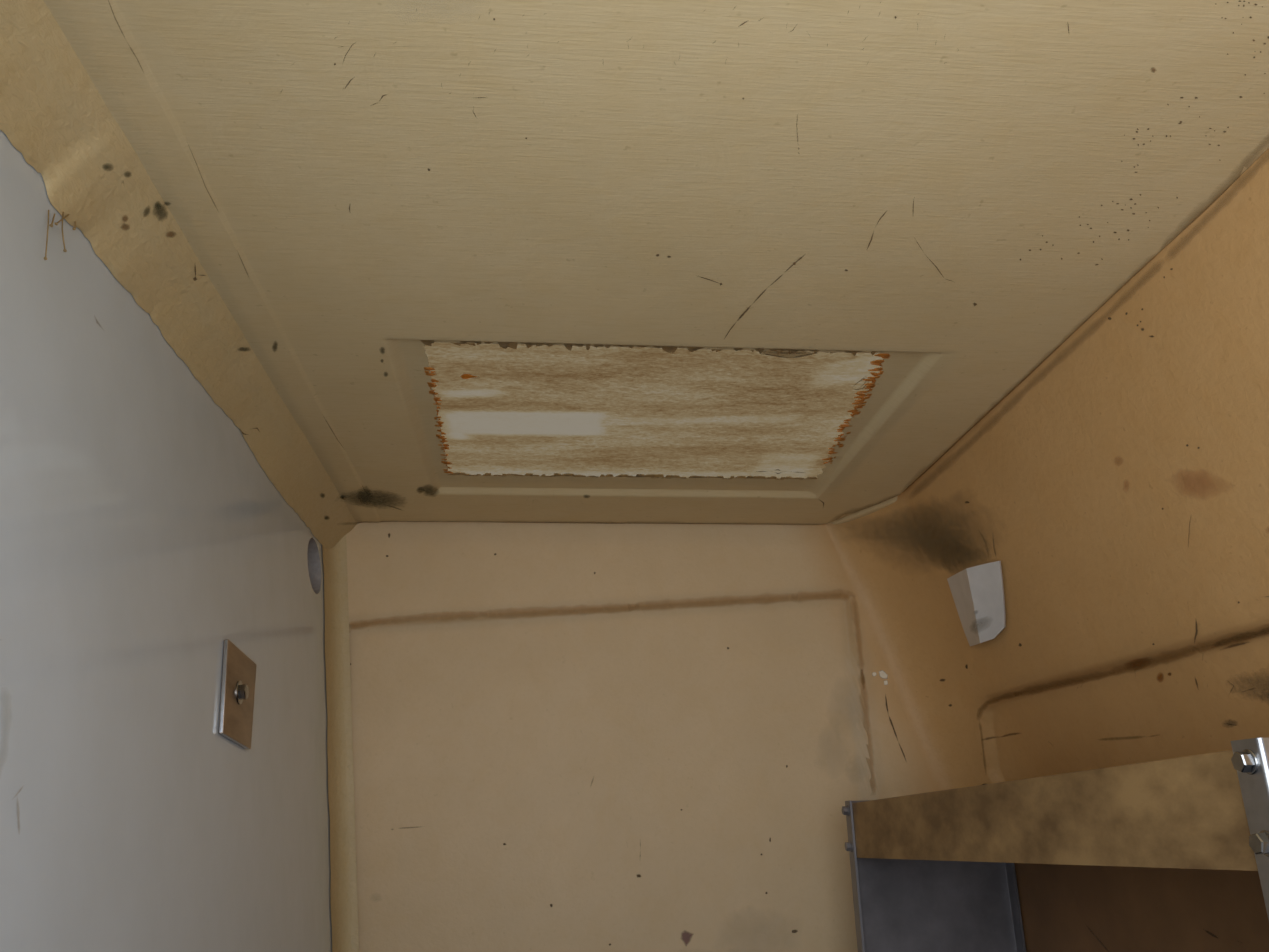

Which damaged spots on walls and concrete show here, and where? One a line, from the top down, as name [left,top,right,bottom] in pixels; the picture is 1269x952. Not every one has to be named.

water stain [341,489,401,510]